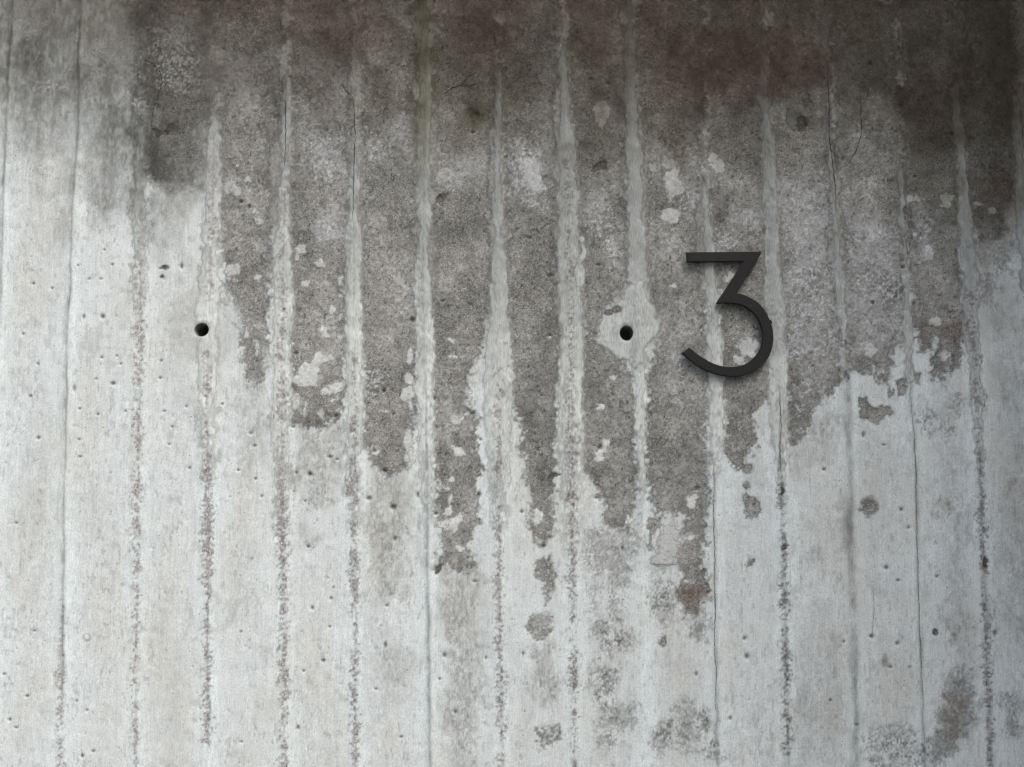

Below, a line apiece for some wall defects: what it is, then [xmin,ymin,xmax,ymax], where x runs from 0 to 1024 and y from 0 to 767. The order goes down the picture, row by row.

efflorescence [299,96,356,179]
efflorescence [512,131,549,202]
crack [827,71,862,210]
leakage [779,187,913,355]
crack [711,469,719,692]